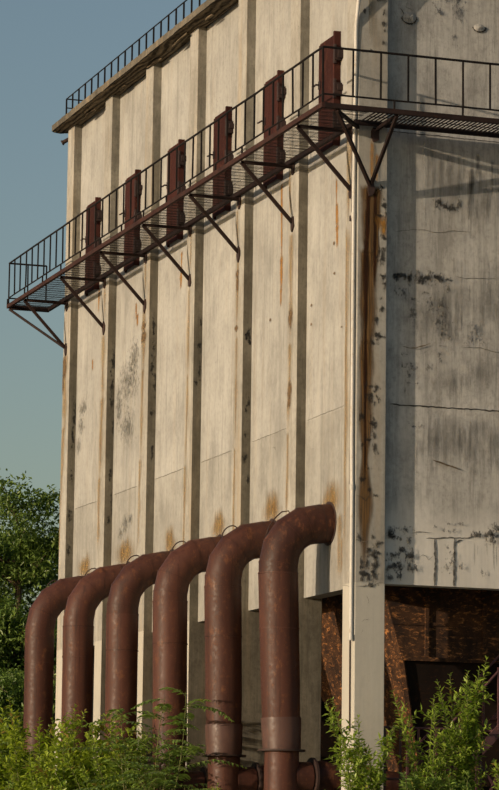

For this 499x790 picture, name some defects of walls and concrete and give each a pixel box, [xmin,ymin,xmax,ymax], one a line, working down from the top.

rust [280,186,292,310]
mould [370,235,451,345]
rust [359,187,386,559]
crack [393,403,499,412]